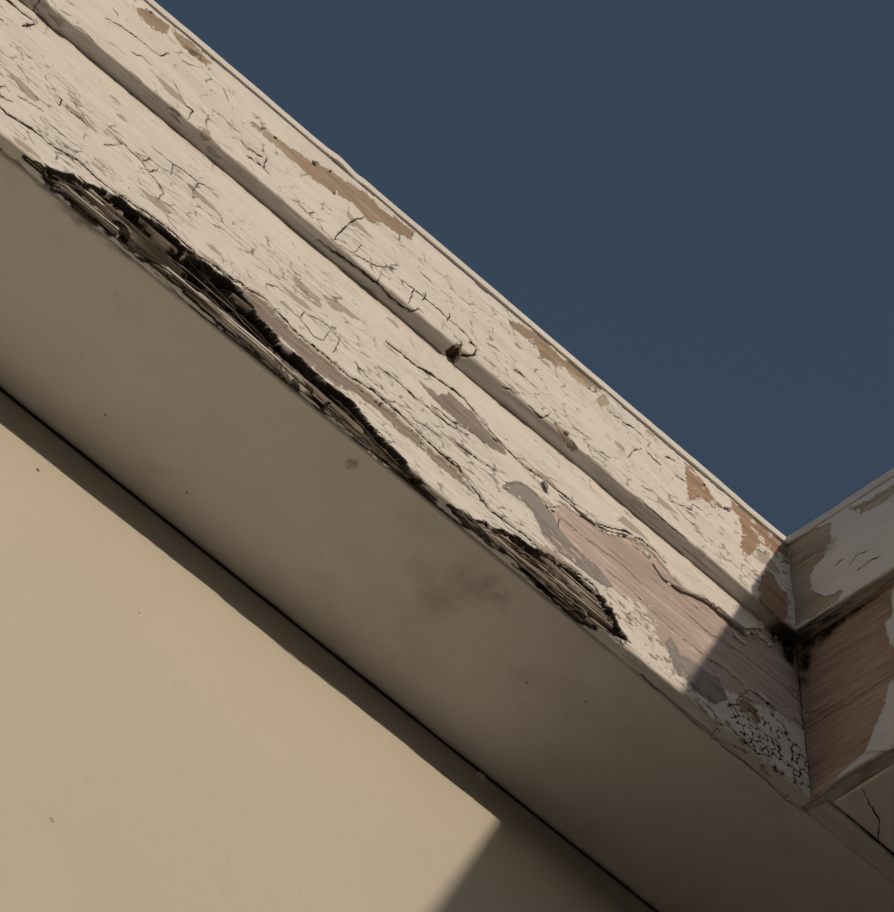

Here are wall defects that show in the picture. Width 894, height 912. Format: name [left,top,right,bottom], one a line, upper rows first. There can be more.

crack [0,0,90,38]
crack [106,7,169,64]
peeling [136,9,211,66]
peeling [250,121,416,240]
crack [0,77,636,645]
peeling [242,292,469,491]
peeling [422,385,505,454]
peeling [509,321,608,406]
crack [503,369,686,482]
crack [595,522,666,564]
peeling [534,463,894,798]
crack [639,598,894,814]